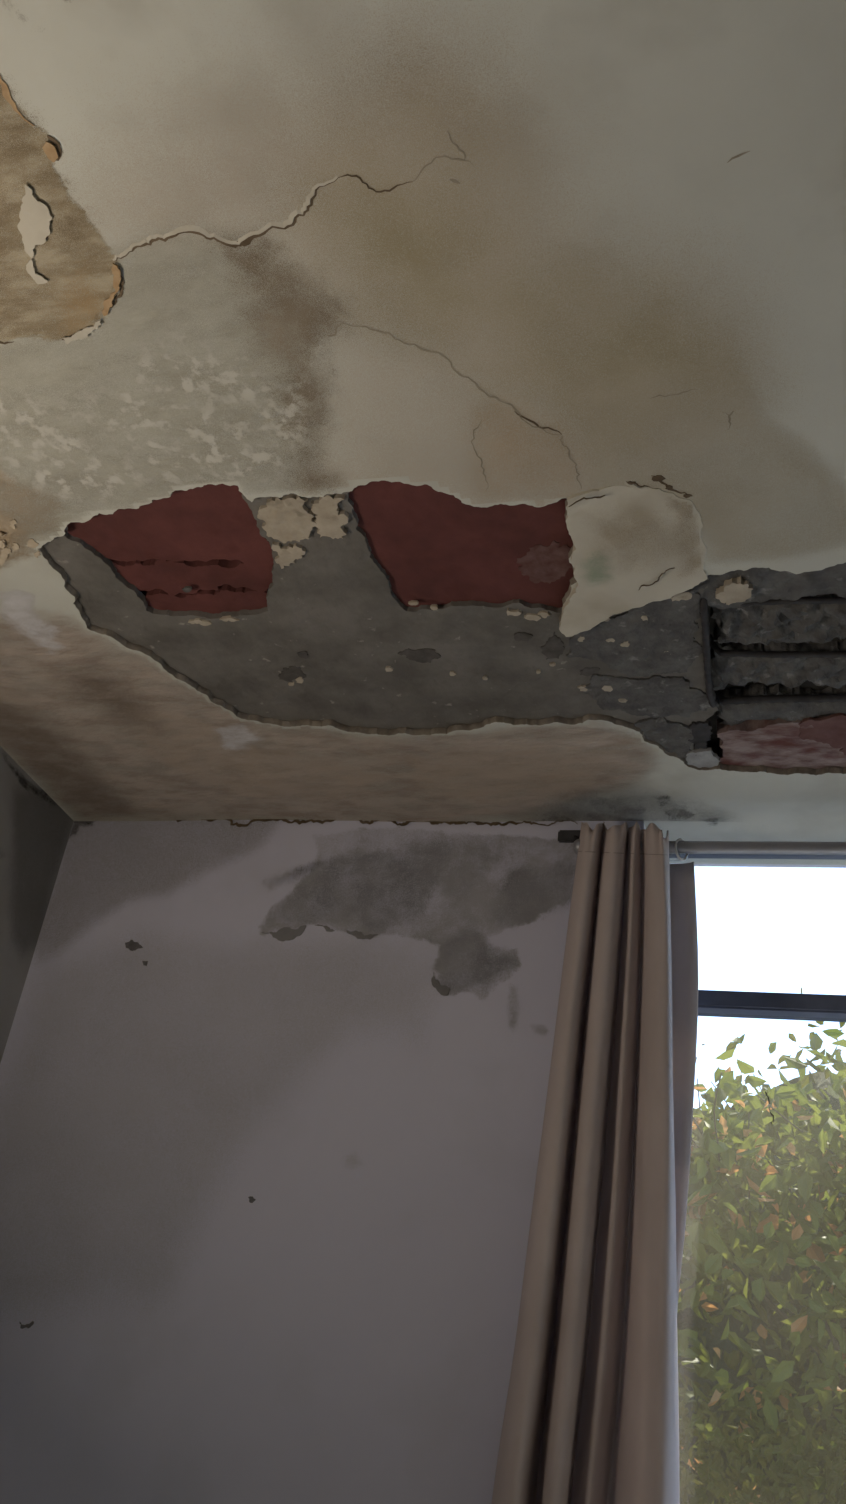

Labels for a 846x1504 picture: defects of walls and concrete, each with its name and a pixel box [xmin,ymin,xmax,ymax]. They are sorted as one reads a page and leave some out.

damp [0,514,41,569]
peeling [0,72,125,344]
crack [112,131,473,261]
spalling [38,480,846,775]
crack [327,321,582,490]
damp [203,0,846,567]
damp [0,589,718,1037]